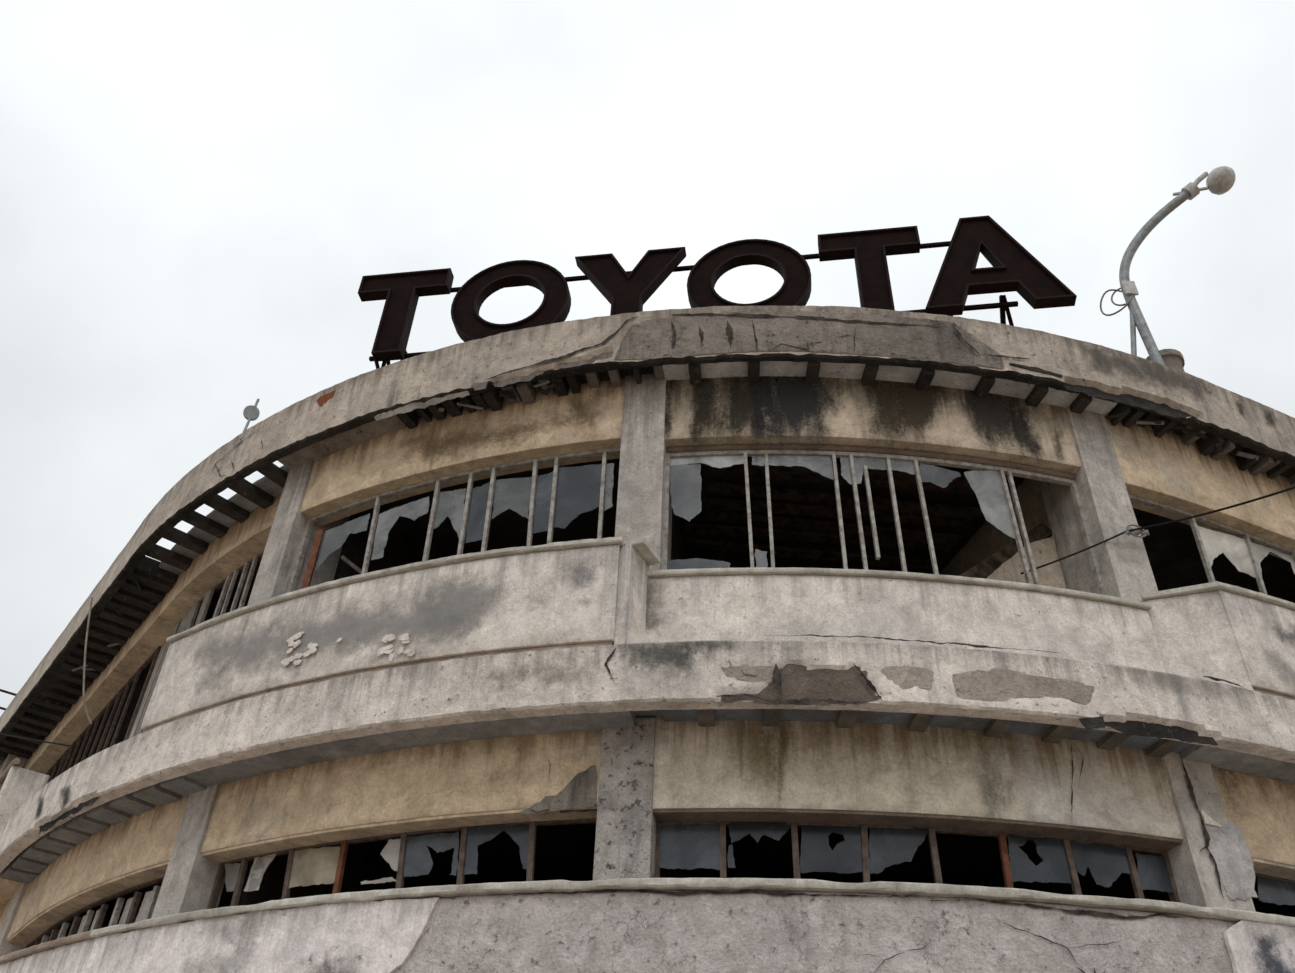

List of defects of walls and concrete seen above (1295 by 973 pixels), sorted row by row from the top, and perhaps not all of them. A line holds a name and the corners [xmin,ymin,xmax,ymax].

crack [487,316,639,379]
crack [671,313,1028,359]
leakage [665,376,834,444]
leakage [855,380,1062,458]
spalling [721,664,934,706]
spalling [953,668,1218,746]
spalling [520,765,598,814]
crack [1070,739,1083,812]
crack [513,753,1224,973]
peeling [0,897,440,973]
peeling [1223,920,1295,973]
leakage [1258,937,1295,973]